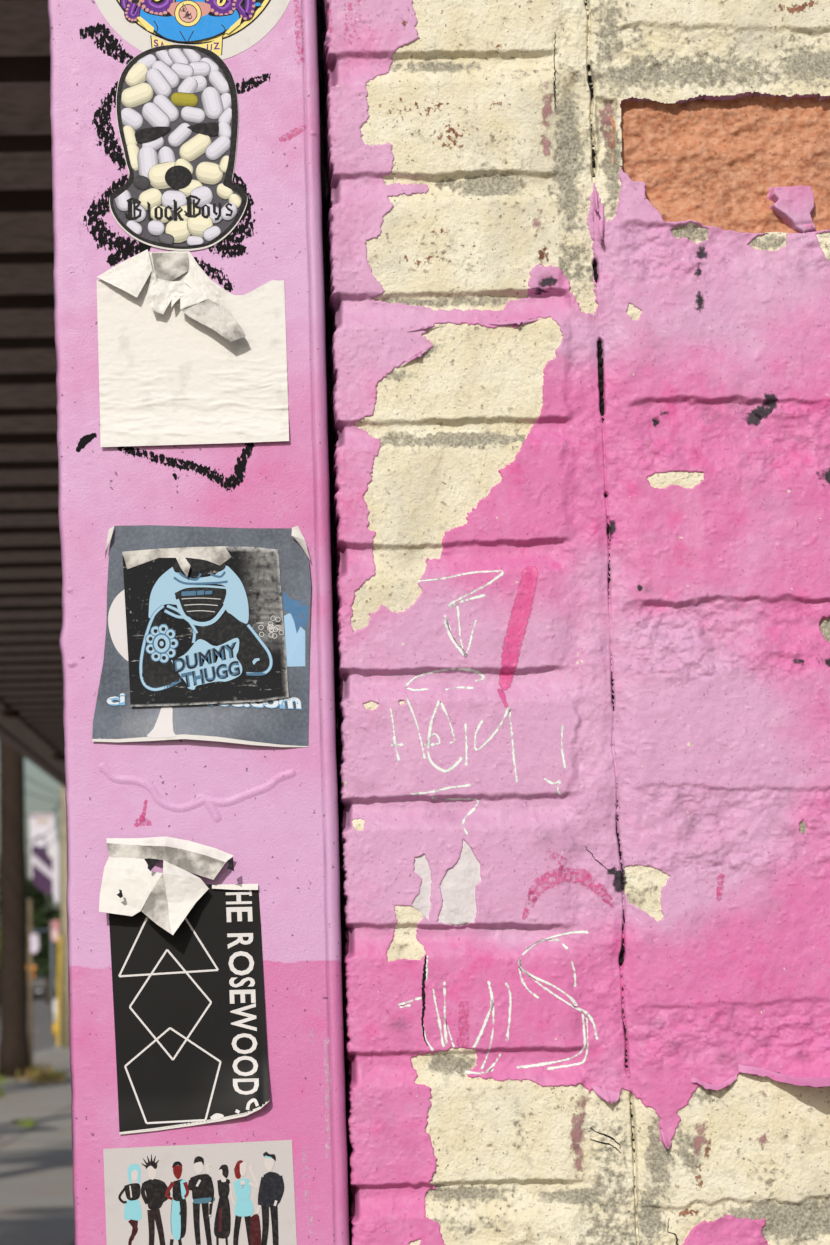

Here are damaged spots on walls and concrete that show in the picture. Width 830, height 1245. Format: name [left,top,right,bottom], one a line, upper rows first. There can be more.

crack [551,34,559,112]
crack [584,0,596,177]
peeling [351,0,830,632]
crack [591,259,599,283]
crack [596,340,604,423]
crack [603,494,611,604]
crack [608,654,616,711]
peeling [387,840,481,962]
peeling [624,865,670,921]
crack [585,783,636,1188]
peeling [411,1047,830,1245]